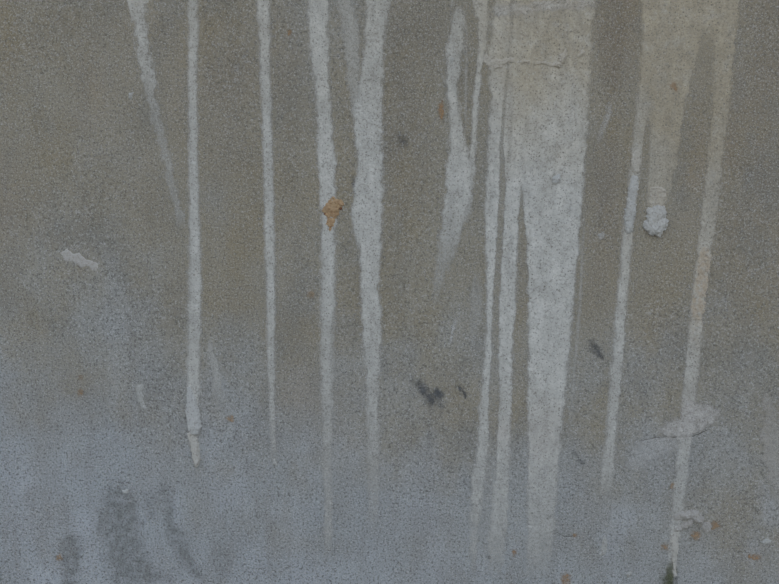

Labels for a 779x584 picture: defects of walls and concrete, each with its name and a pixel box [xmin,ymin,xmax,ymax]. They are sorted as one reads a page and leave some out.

efflorescence [127,0,156,106]
efflorescence [185,0,202,467]
efflorescence [256,0,275,447]
efflorescence [307,0,391,536]
efflorescence [440,0,595,556]
efflorescence [601,0,739,577]